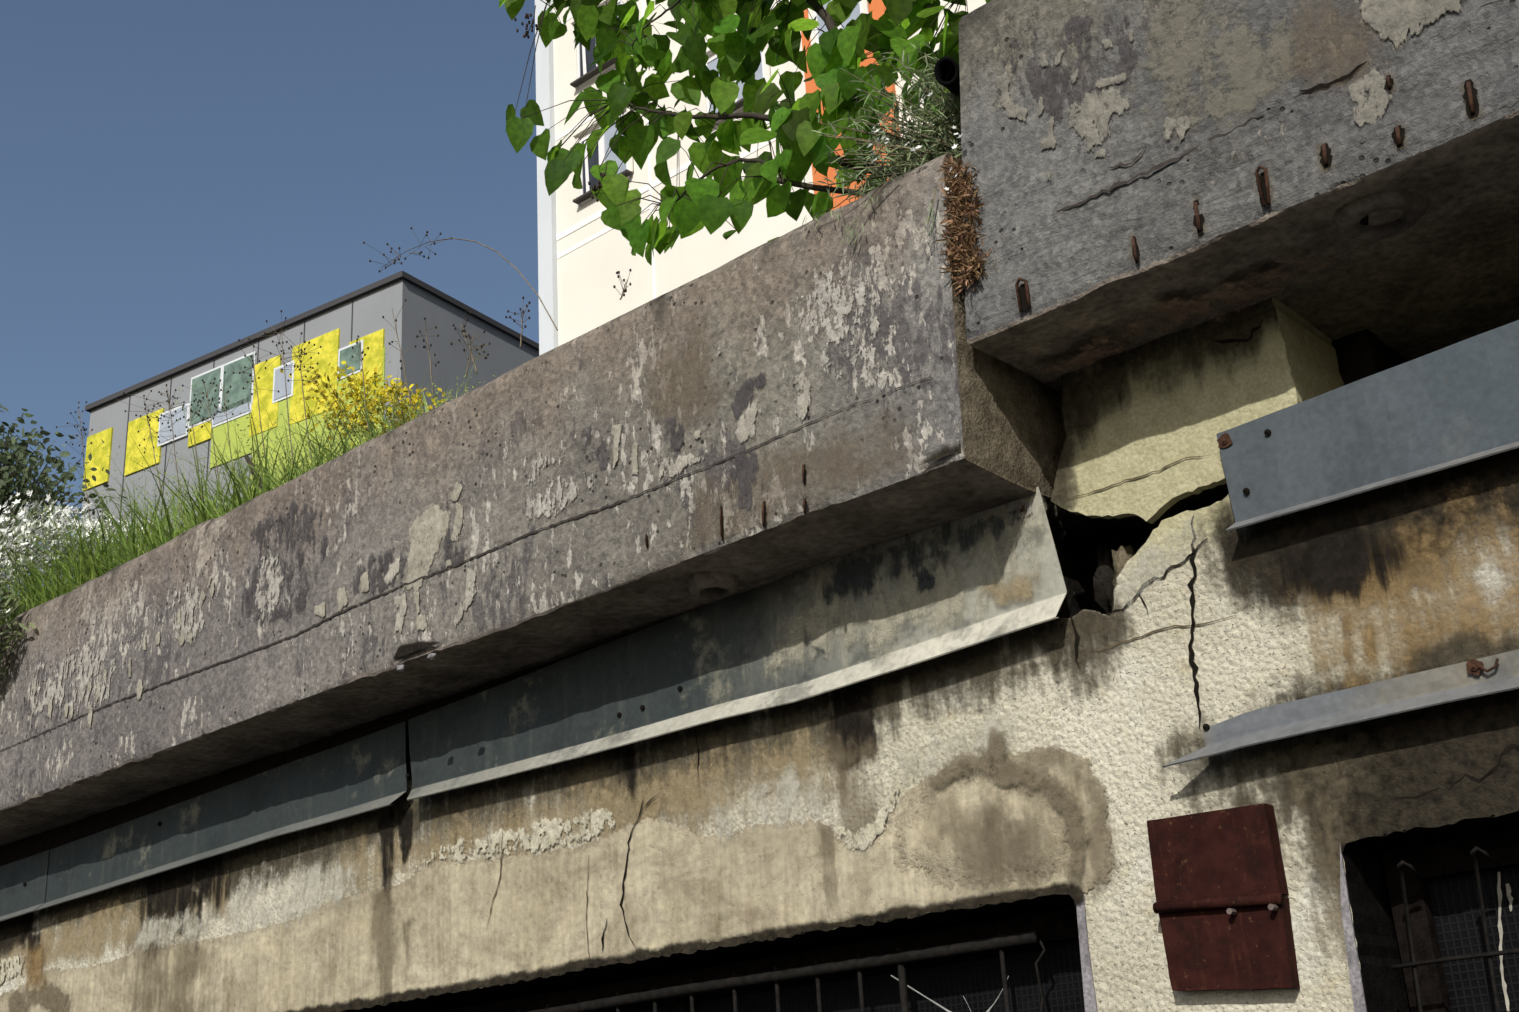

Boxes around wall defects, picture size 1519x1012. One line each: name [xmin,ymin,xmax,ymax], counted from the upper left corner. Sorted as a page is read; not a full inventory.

peeling [996,49,1131,158]
peeling [1360,0,1461,50]
peeling [792,263,888,420]
peeling [27,576,214,728]
peeling [314,481,476,673]
damp [766,511,1038,668]
crack [1070,515,1236,728]
rust [1312,521,1519,686]
damp [0,711,859,1012]
crack [586,788,660,954]
damp [834,782,900,851]
damp [907,716,1105,884]